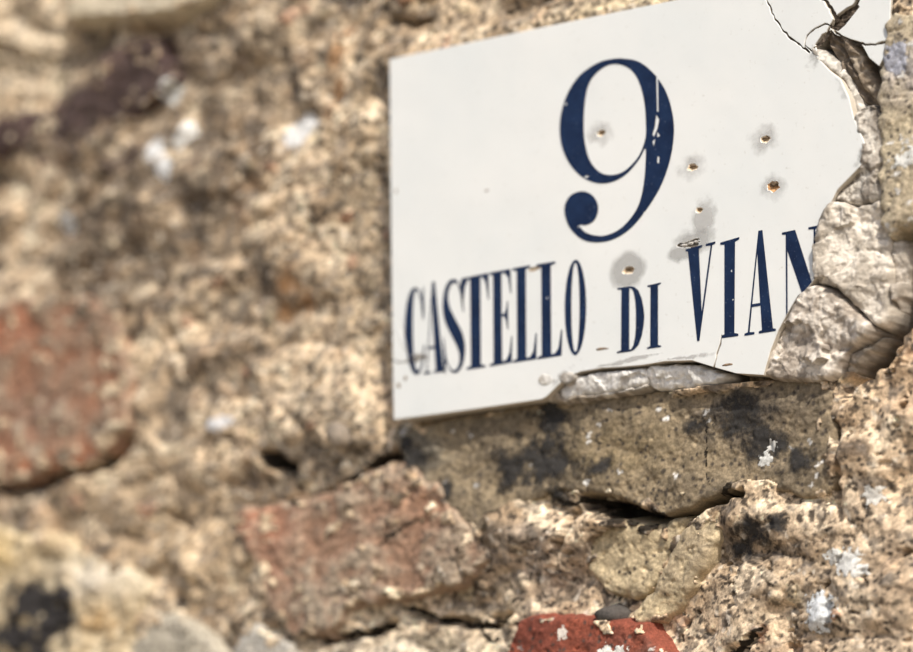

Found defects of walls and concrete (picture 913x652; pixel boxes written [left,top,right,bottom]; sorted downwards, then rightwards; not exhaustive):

crack [768,0,885,53]
leakage [401,436,431,475]
leakage [490,402,613,509]
leakage [436,478,453,502]